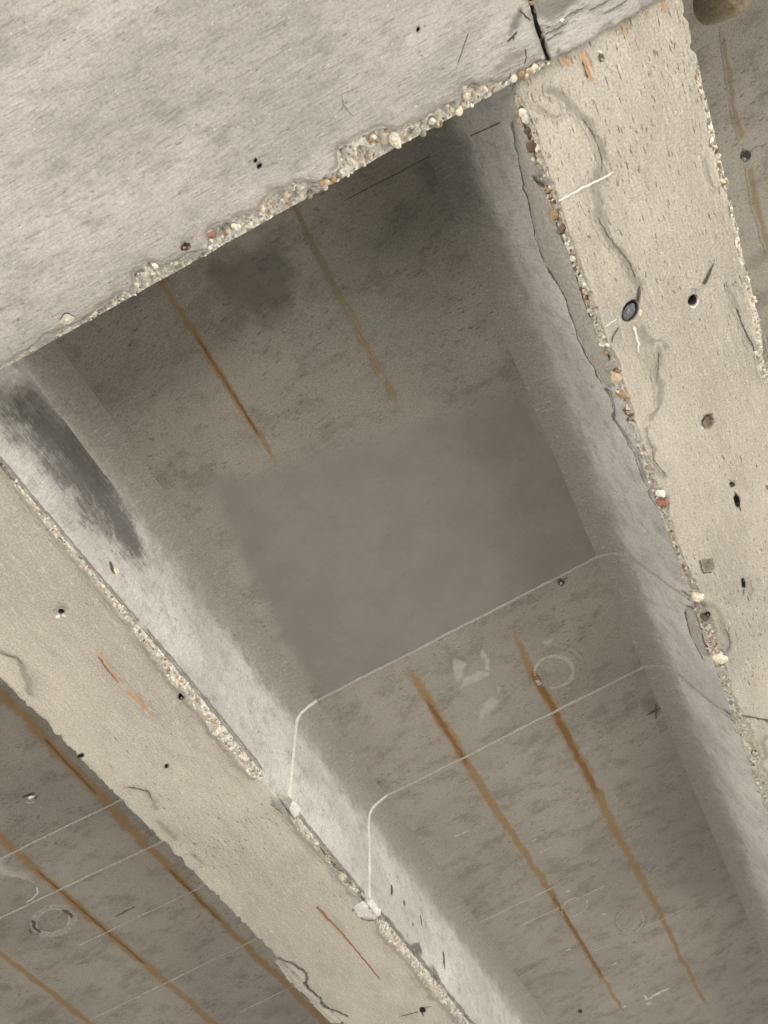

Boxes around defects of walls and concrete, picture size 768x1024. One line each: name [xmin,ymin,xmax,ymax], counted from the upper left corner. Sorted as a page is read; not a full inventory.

water stain [0,361,142,556]
rust [157,279,283,470]
rust [290,203,406,418]
spalling [0,54,768,814]
crack [346,156,430,200]
crack [471,0,673,506]
spalling [283,814,367,904]
rust [317,907,380,979]
rust [398,661,628,1016]
rust [505,621,712,1013]